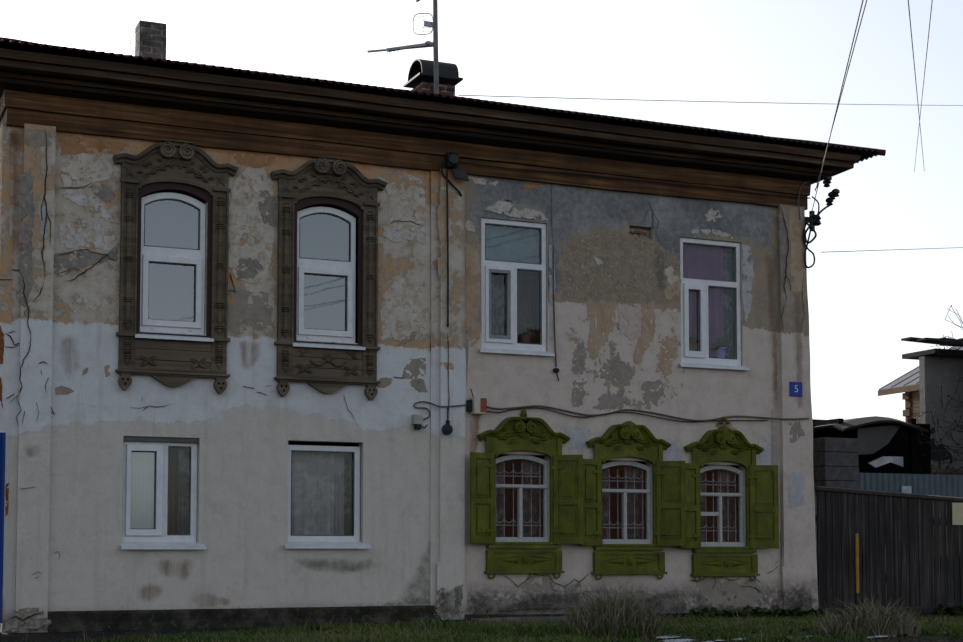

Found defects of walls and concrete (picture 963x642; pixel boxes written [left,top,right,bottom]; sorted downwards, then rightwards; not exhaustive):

crack [0,132,118,424]
peeling [19,133,129,308]
peeling [376,358,428,392]
peeling [378,173,431,346]
peeling [465,243,481,347]
peeling [571,266,682,411]
spalling [629,226,650,239]
peeling [691,208,754,322]